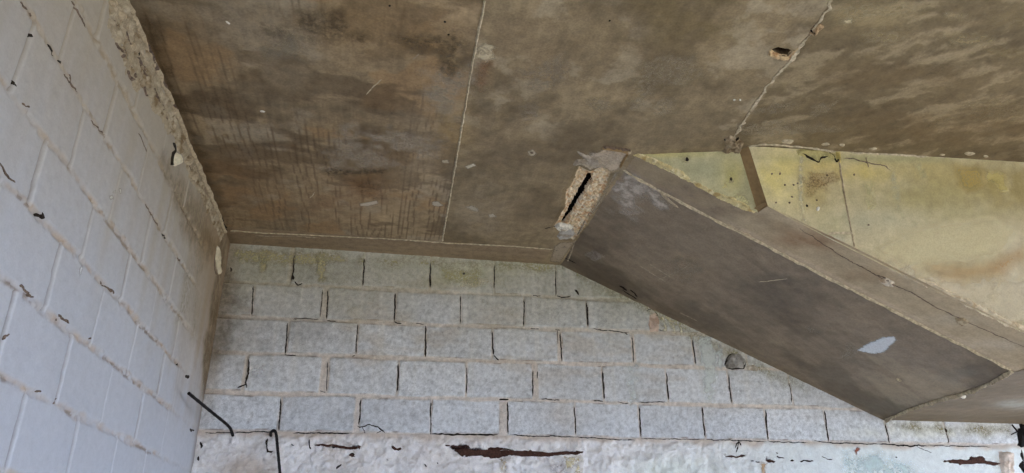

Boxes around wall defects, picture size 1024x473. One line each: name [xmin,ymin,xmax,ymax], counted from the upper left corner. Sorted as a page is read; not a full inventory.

hole [768,45,799,61]
spalling [107,0,224,275]
spalling [545,146,755,242]
crack [845,158,890,170]
crack [802,230,1024,347]